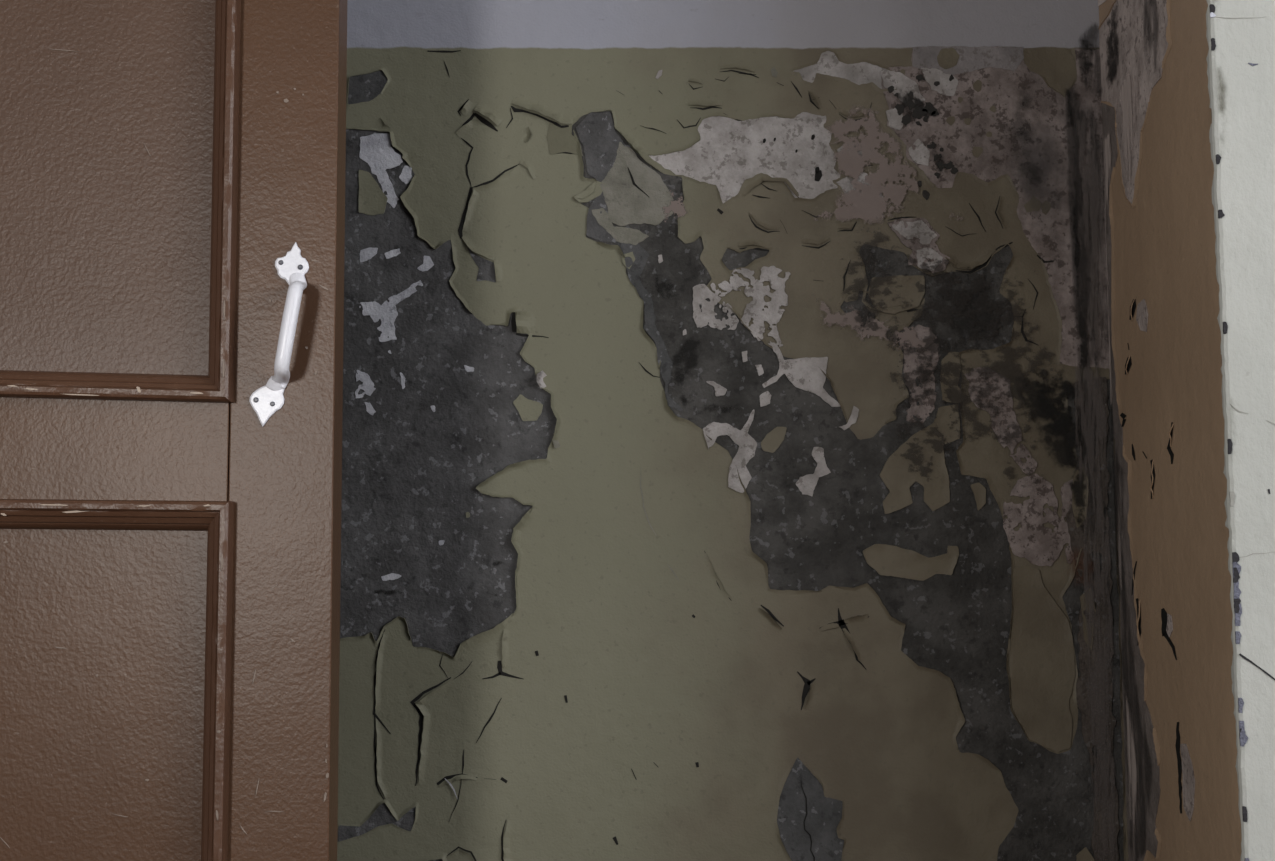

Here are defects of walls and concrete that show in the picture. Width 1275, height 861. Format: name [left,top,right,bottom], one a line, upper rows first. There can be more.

peeling [346,66,392,109]
water stain [888,46,1024,126]
crack [427,50,583,239]
water stain [917,141,958,200]
peeling [340,118,563,662]
peeling [567,0,1172,861]
water stain [1019,25,1162,861]
crack [701,551,784,632]
peeling [1232,552,1242,644]
crack [373,629,523,861]
crack [797,671,819,711]
peeling [1238,698,1248,746]